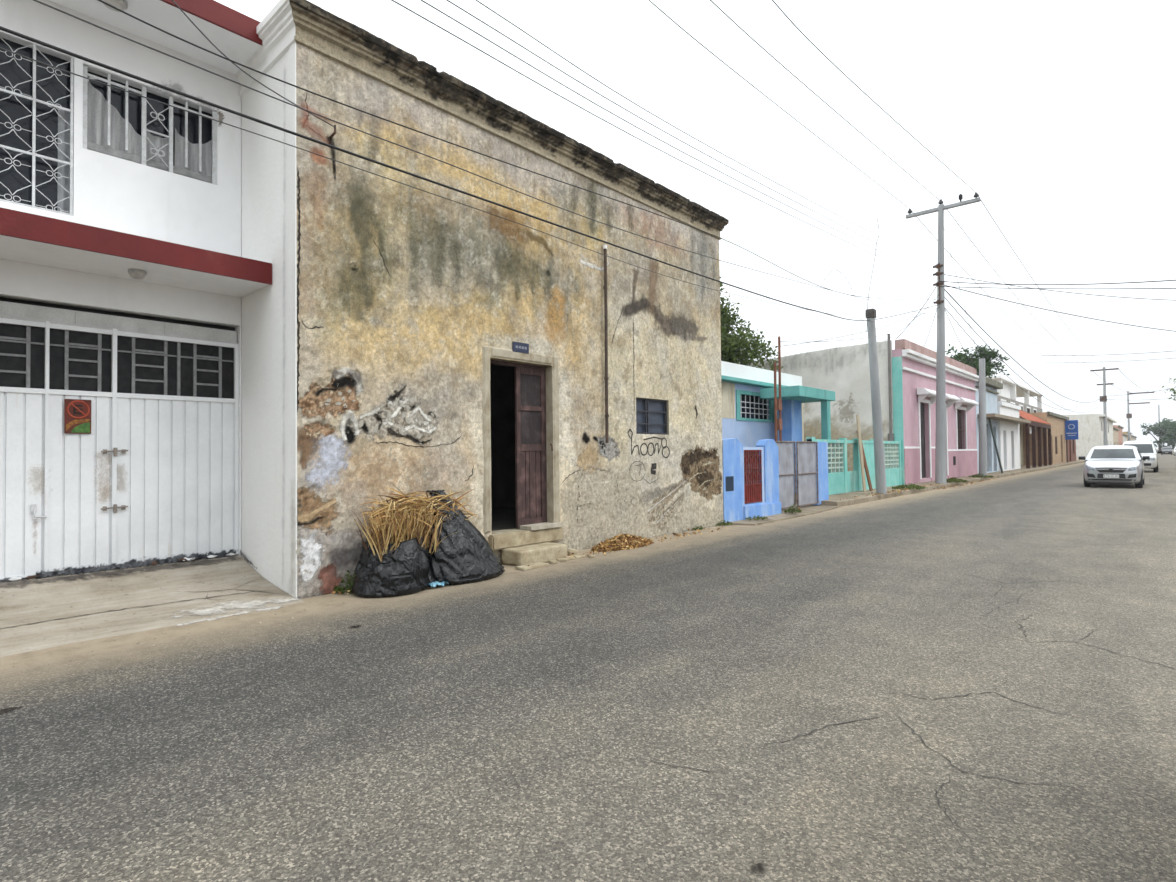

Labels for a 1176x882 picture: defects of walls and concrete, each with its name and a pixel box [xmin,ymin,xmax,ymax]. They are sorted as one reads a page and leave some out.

damp [351,186,386,257]
damp [527,232,553,256]
damp [623,261,707,341]
flaking render [298,368,437,444]
flaking render [647,445,722,529]